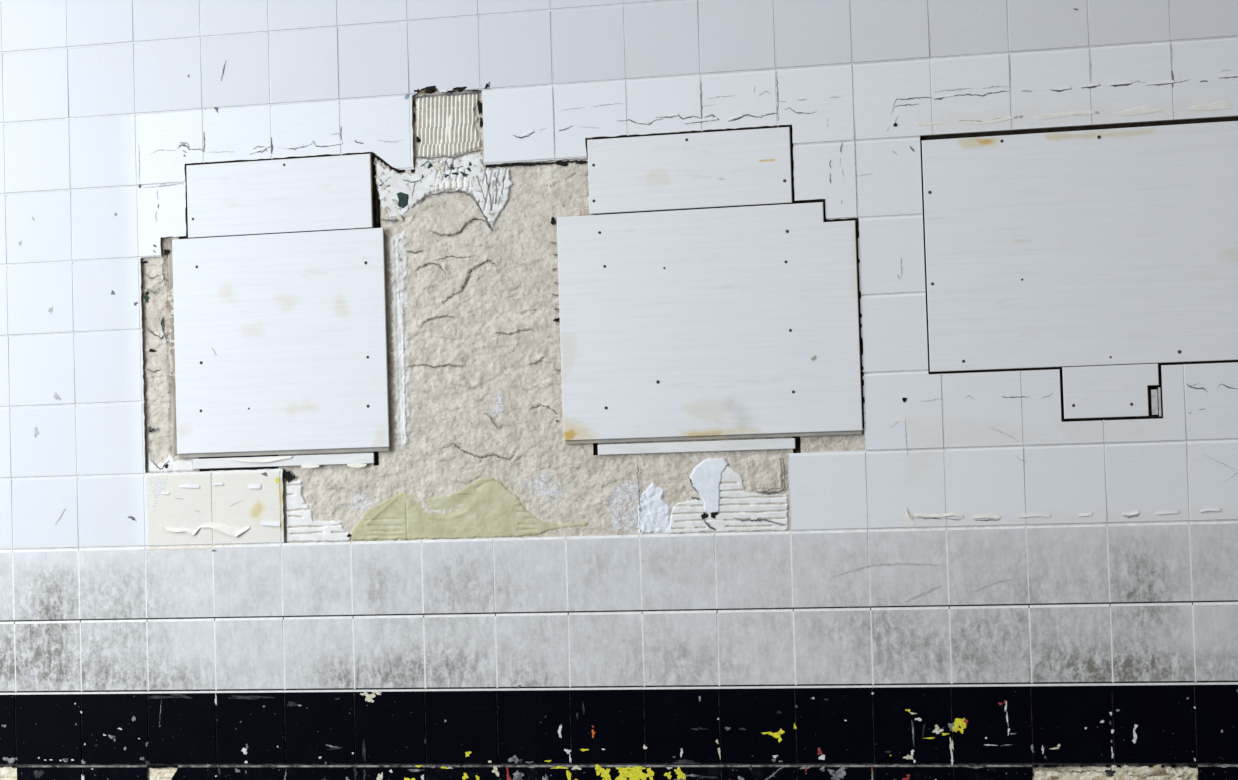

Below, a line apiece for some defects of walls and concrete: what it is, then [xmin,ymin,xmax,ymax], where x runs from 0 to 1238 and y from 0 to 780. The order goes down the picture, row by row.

crack [887,44,1238,155]
crack [513,71,869,204]
spalling [134,84,866,543]
spalling [0,757,17,780]
peeling [34,757,93,780]
spalling [138,738,178,780]
peeling [319,741,366,780]
peeling [508,755,548,780]
peeling [673,749,718,780]
peeling [800,765,846,780]
peeling [871,717,925,780]
spalling [1031,709,1198,780]